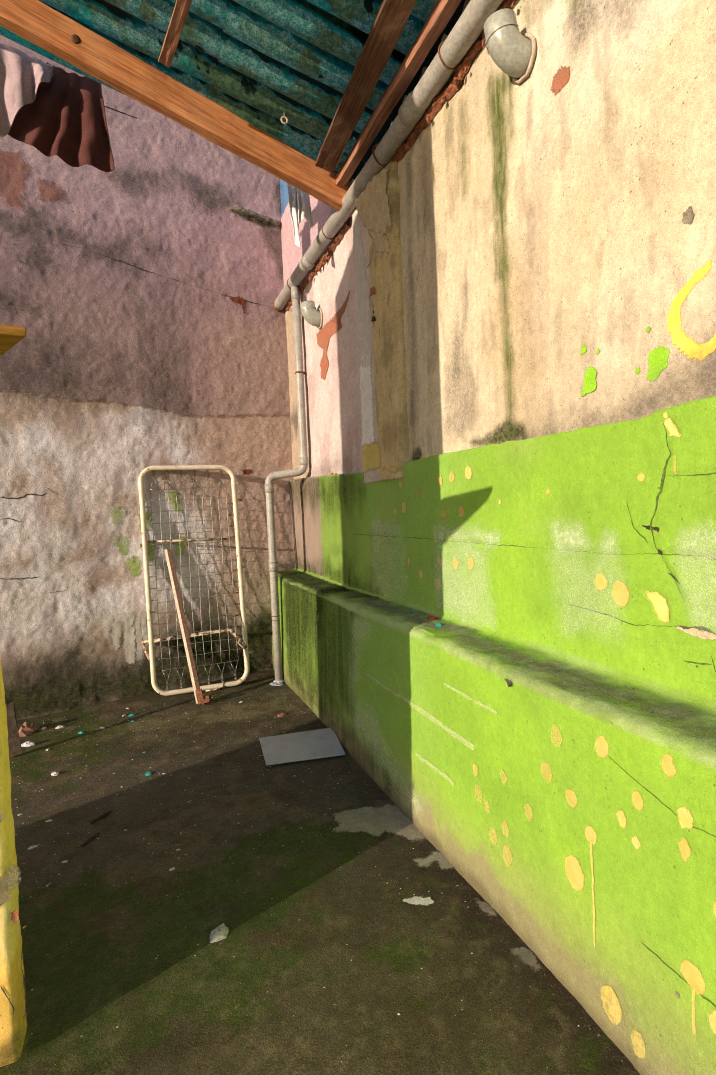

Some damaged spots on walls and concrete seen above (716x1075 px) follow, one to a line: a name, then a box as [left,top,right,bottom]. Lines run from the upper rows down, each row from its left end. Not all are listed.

spalling [551,66,570,95]
spalling [316,291,350,380]
crack [1,488,74,522]
crack [353,420,716,591]
spalling [647,591,716,641]
peeling [0,865,25,929]